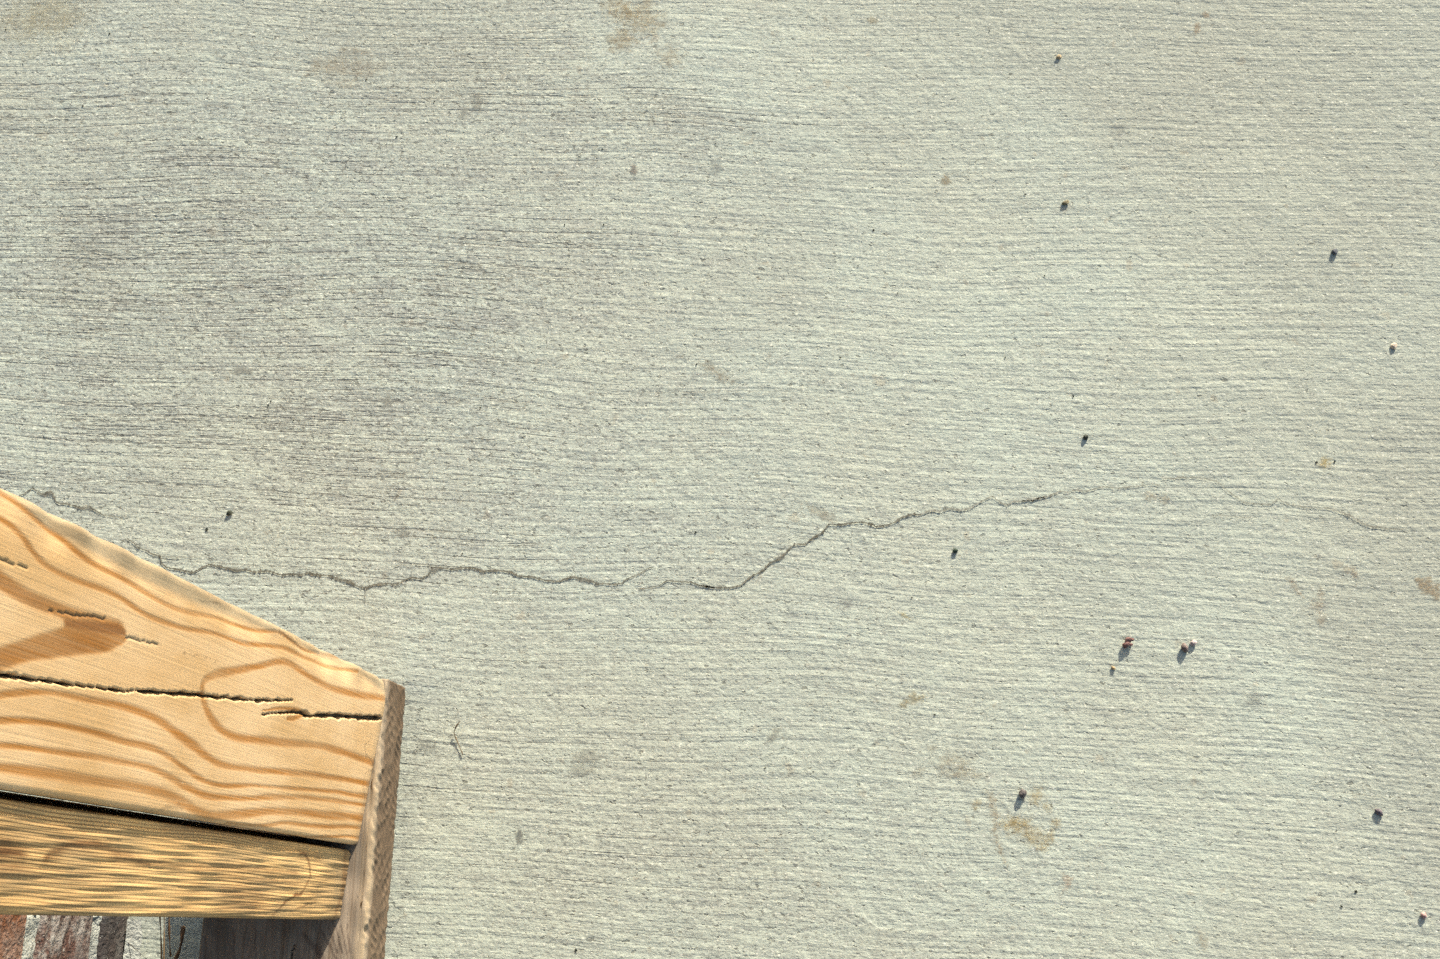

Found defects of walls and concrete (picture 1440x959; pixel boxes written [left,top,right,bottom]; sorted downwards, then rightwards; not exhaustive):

crack [19,477,1439,607]